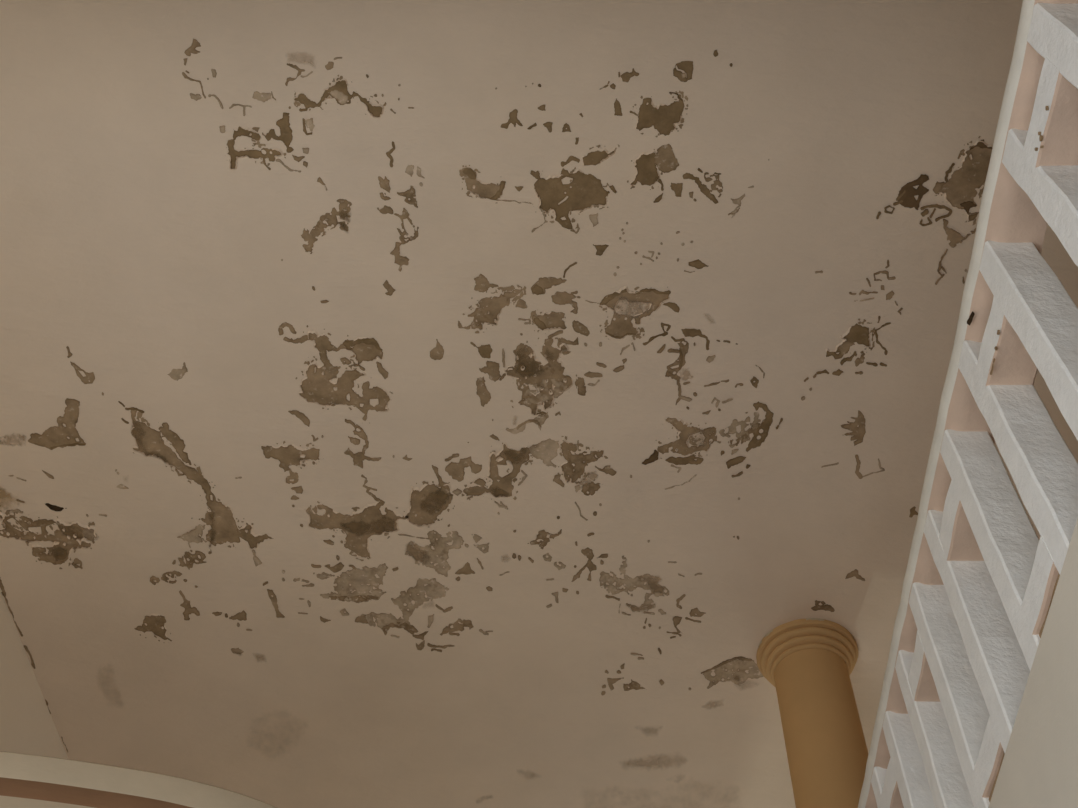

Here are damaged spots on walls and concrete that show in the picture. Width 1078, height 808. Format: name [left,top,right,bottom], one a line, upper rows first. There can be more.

peeling [182,39,414,173]
peeling [301,199,352,254]
spalling [459,105,620,234]
spalling [600,61,754,218]
spalling [876,136,993,285]
spalling [0,398,86,450]
spalling [0,503,107,569]
spalling [118,401,274,631]
spalling [261,262,783,652]
spalling [801,319,887,401]
peeling [134,613,172,641]
spalling [701,656,763,689]